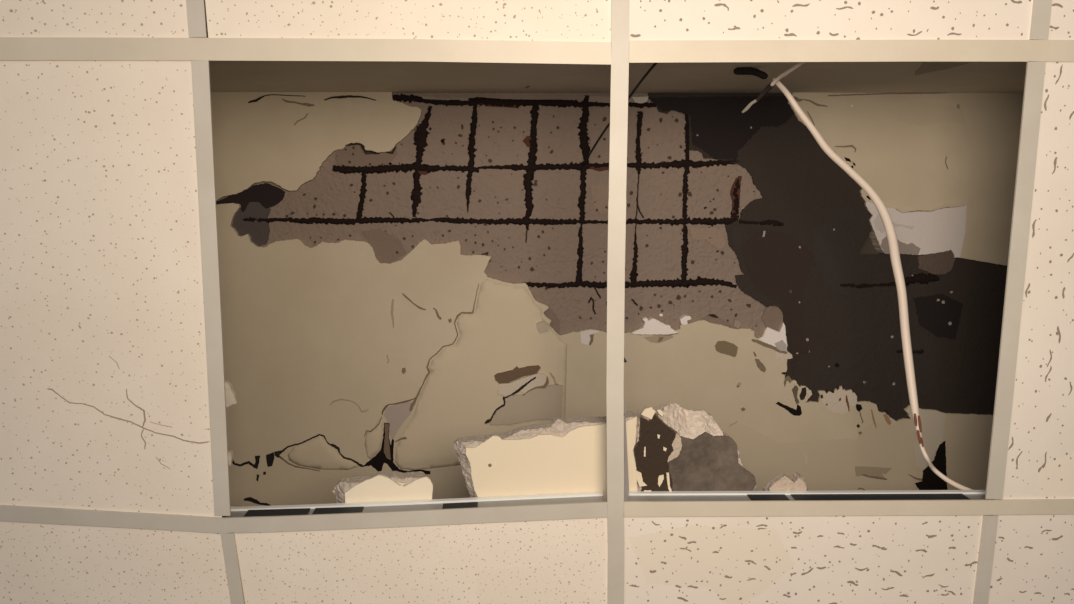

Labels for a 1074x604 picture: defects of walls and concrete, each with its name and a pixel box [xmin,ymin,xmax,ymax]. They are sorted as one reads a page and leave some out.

crack [47,356,210,469]
crack [280,284,479,471]
rust [242,93,610,289]
spalling [254,93,610,345]
crack [485,373,558,424]
rust [625,102,784,288]
spalling [624,93,792,361]
damp [649,95,795,160]
damp [730,220,859,416]
flaking render [866,196,966,258]
flaking render [907,407,947,490]
damp [897,294,963,396]